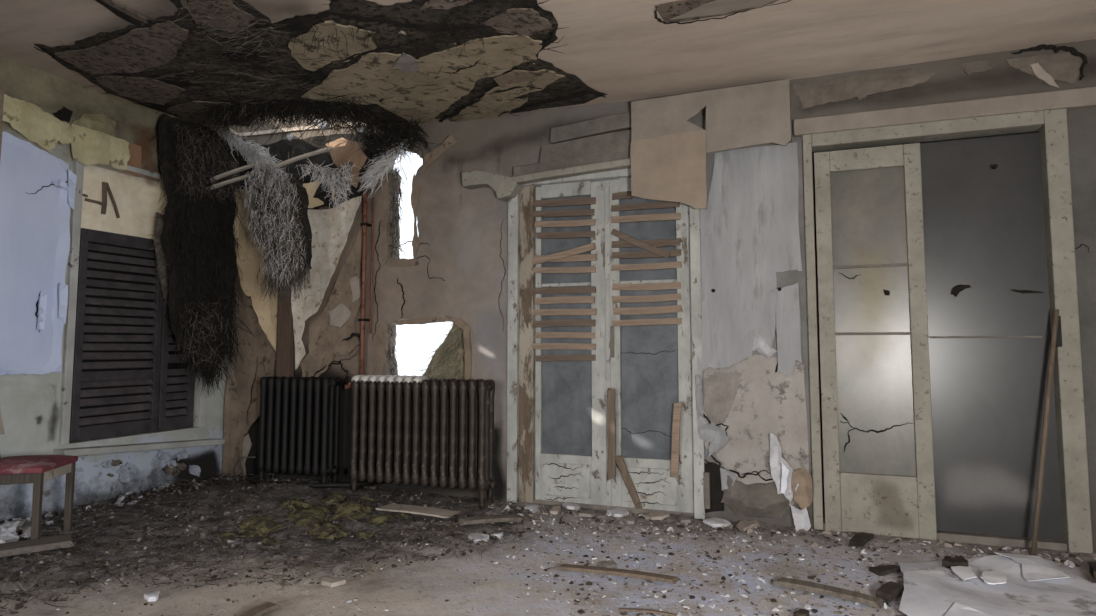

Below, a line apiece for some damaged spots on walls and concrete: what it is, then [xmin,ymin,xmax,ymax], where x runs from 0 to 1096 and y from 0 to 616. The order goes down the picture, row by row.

flaking render [34,0,608,159]
flaking render [793,68,937,111]
flaking render [1005,44,1088,88]
spalling [380,134,458,268]
flaking render [222,282,276,477]
flaking render [299,226,363,384]
spalling [375,315,472,380]
flaking render [487,355,1096,569]
crack [840,413,913,453]